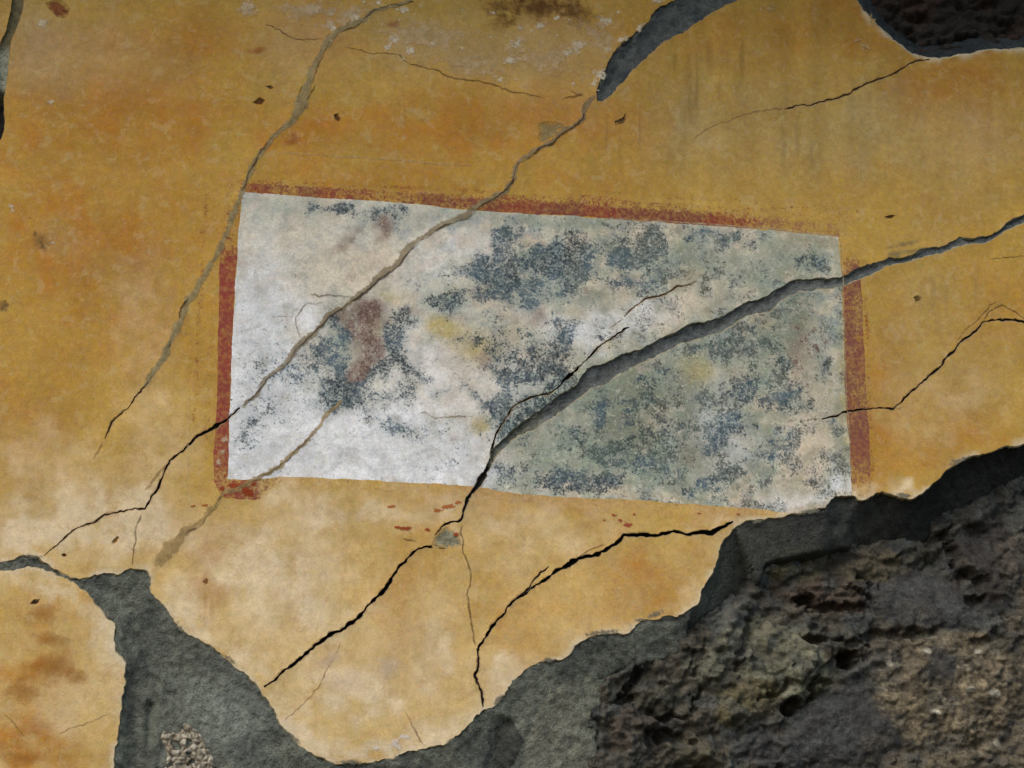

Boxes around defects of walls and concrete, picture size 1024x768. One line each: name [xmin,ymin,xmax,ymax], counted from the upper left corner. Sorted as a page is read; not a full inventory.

peeling [504,16,570,64]
peeling [550,25,642,61]
flaking render [857,0,1024,60]
crack [697,59,929,136]
crack [44,0,738,565]
crack [264,215,1024,707]
flaking render [0,444,1024,768]